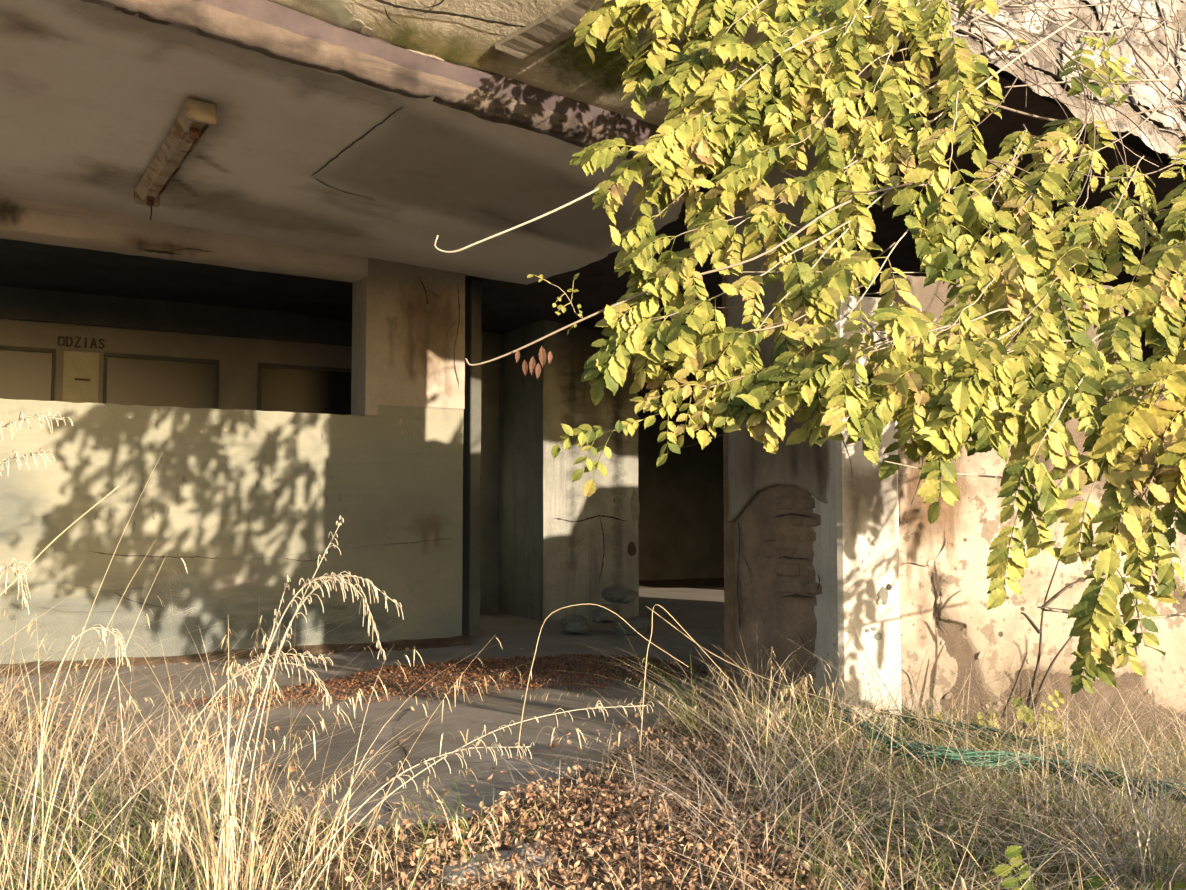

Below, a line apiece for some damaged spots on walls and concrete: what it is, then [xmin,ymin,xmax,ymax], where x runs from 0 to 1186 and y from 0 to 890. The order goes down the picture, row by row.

crack [375,0,527,27]
crack [311,106,403,200]
crack [89,539,444,561]
crack [28,582,174,613]
spalling [728,476,828,714]